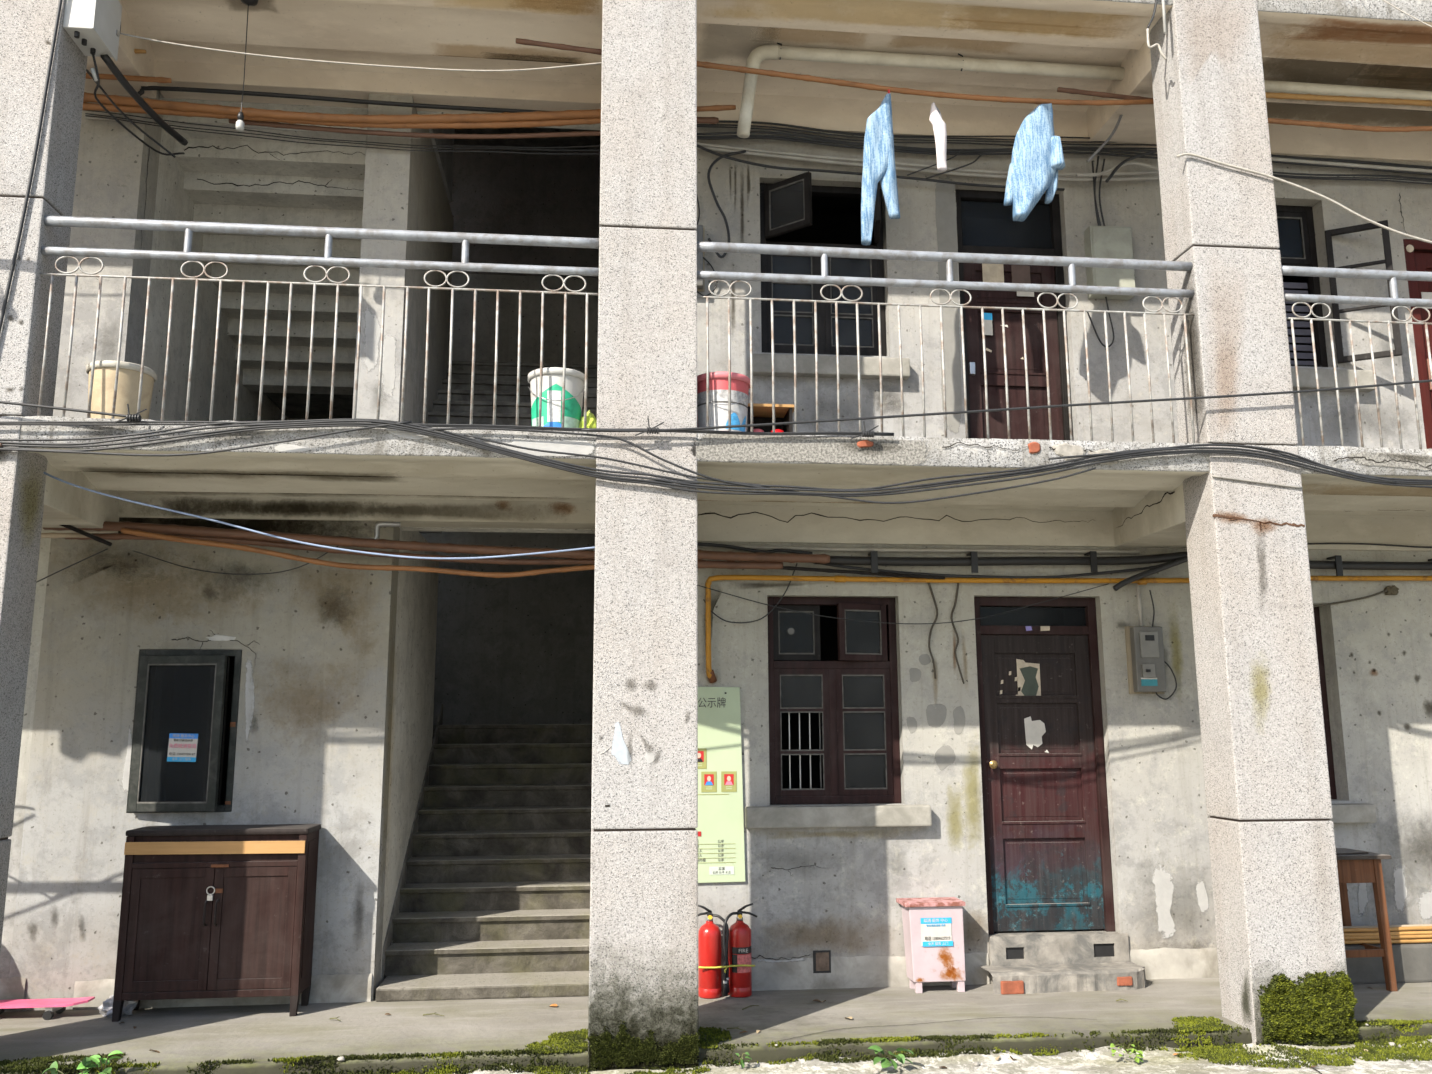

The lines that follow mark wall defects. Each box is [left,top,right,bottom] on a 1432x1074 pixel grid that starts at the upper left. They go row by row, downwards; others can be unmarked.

crack [698,491,1175,528]
crack [1212,514,1305,531]
flaking render [907,704,965,771]
flaking render [1152,865,1176,938]
flaking render [1196,881,1209,913]
flaking render [1394,865,1432,919]
damp [588,1008,699,1071]